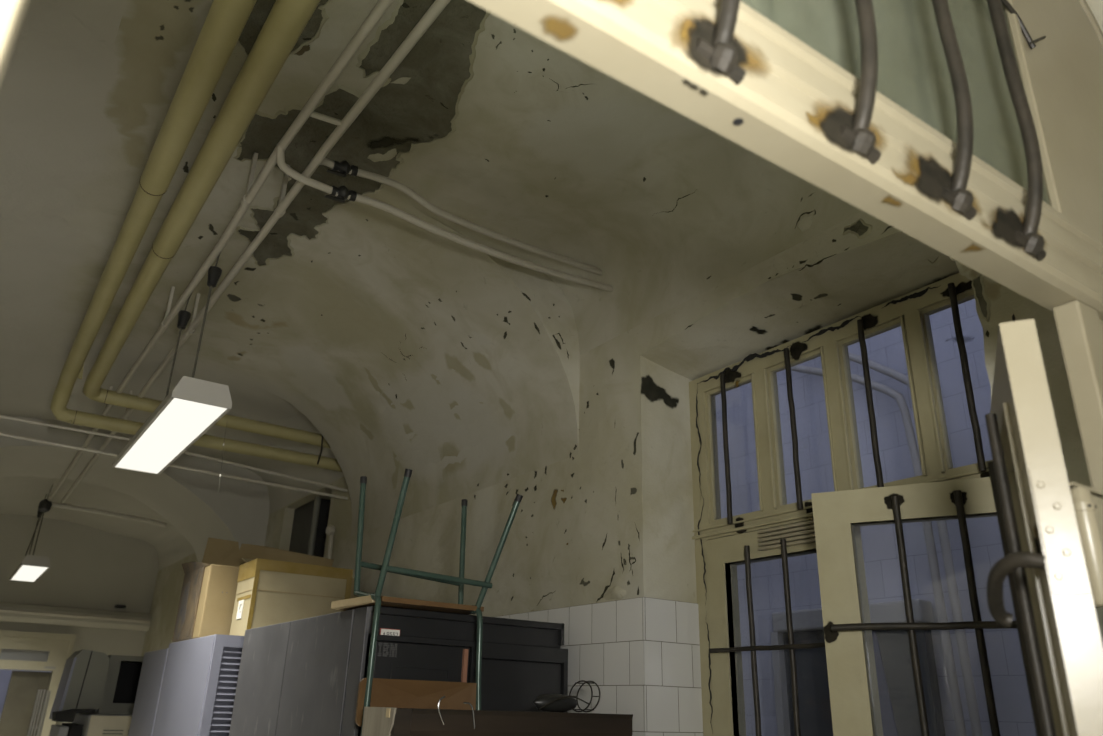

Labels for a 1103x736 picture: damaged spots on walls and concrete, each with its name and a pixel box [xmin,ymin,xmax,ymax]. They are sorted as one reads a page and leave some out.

rust [543,17,577,39]
rust [678,18,720,74]
rust [731,36,766,71]
flaking render [233,0,516,271]
rust [806,105,855,151]
rust [895,151,952,204]
crack [884,285,941,307]
crack [696,316,860,731]
crack [596,524,640,603]